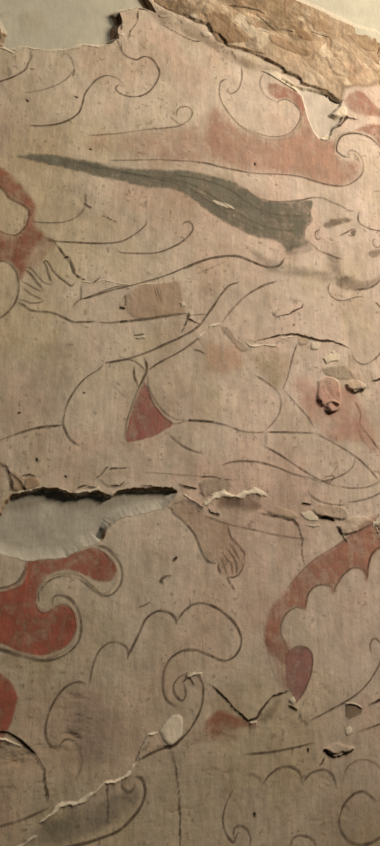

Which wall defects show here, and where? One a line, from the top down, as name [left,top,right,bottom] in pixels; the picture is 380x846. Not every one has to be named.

crack [159,5,334,99]
crack [247,305,346,349]
crack [1,464,40,491]
flaking render [0,467,176,561]
crack [213,687,307,724]
crack [0,731,123,846]
spalling [121,714,183,846]